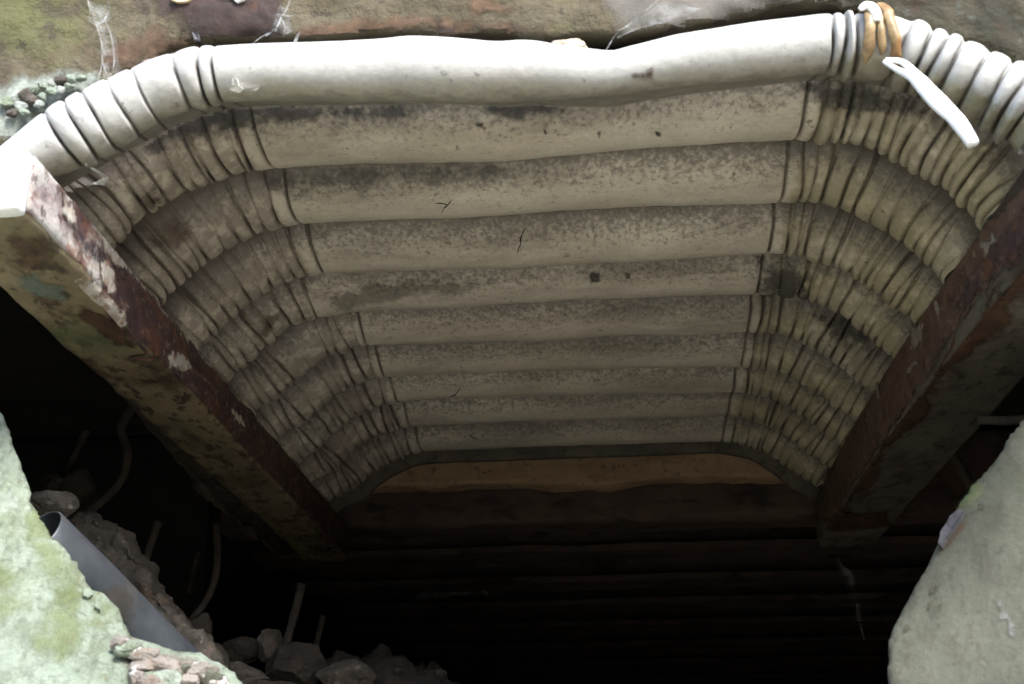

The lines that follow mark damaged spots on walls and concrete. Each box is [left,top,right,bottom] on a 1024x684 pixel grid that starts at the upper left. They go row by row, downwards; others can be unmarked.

leakage [488,105,563,119]
leakage [807,83,910,116]
leakage [756,256,810,303]
leakage [813,315,868,343]
rust [61,186,350,561]
rust [815,187,1024,521]